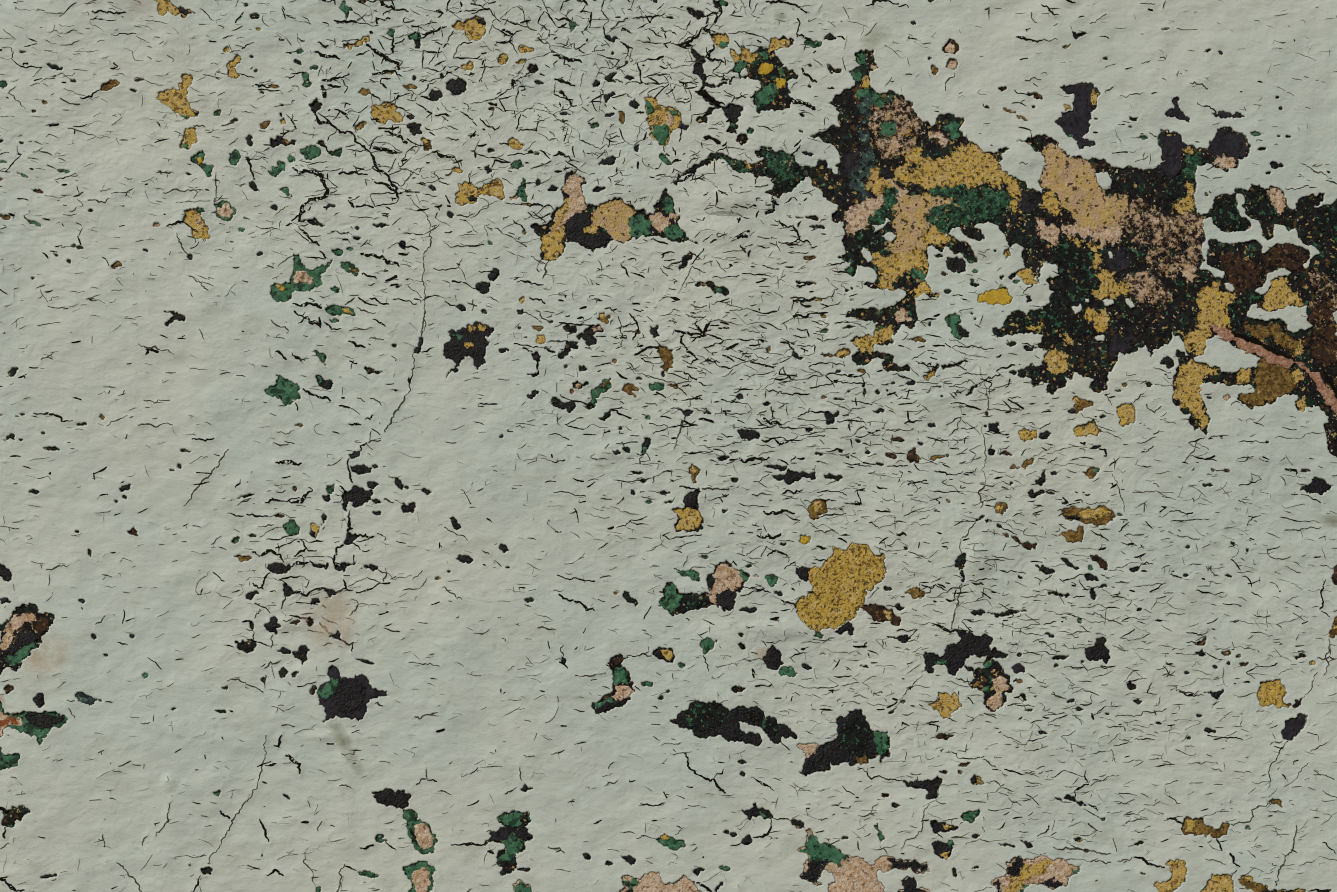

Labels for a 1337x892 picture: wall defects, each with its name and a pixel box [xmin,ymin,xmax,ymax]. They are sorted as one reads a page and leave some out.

crack [866,0,909,8]
crack [959,0,1232,167]
crack [37,225,134,317]
peeling [444,34,1337,457]
crack [127,329,204,374]
crack [434,369,519,444]
crack [78,466,149,519]
peeling [659,543,936,655]
peeling [310,631,387,721]
peeling [923,629,1032,740]
peeling [671,686,983,807]
peeling [724,803,980,892]